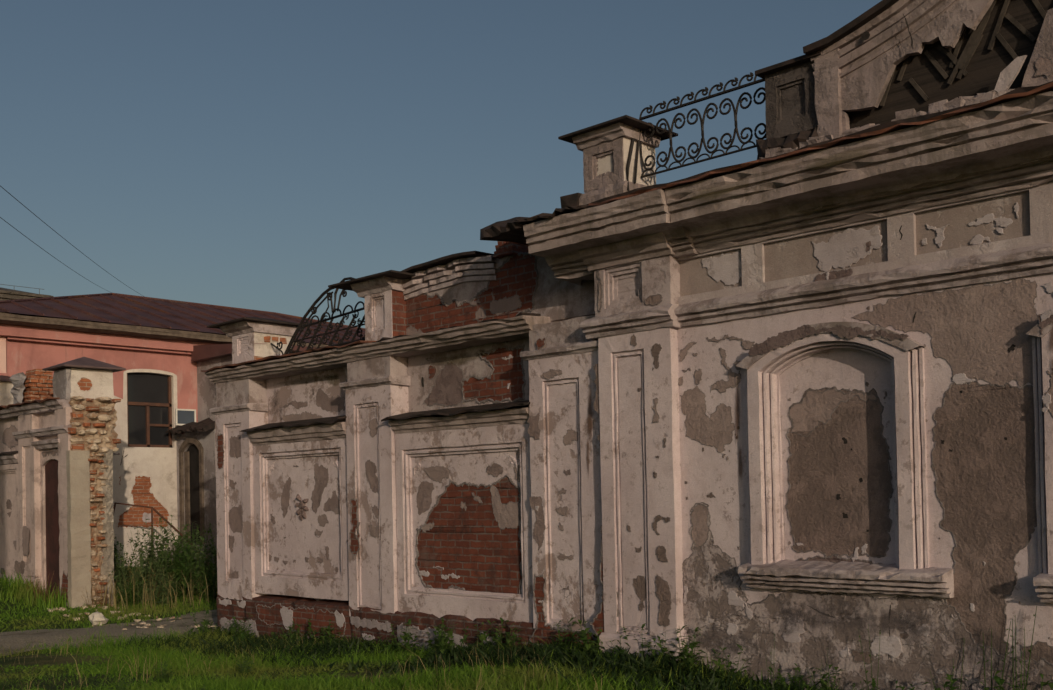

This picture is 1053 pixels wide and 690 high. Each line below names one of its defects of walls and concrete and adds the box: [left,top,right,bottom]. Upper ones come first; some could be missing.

flaking render [924,0,1037,92]
flaking render [406,252,539,335]
peeling [812,225,883,281]
peeling [968,202,1019,245]
flaking render [421,337,546,407]
peeling [563,429,578,446]
spalling [41,376,170,605]
peeling [269,459,379,572]
flaking render [415,463,604,649]
peeling [633,278,1053,690]
flaking render [219,599,467,653]